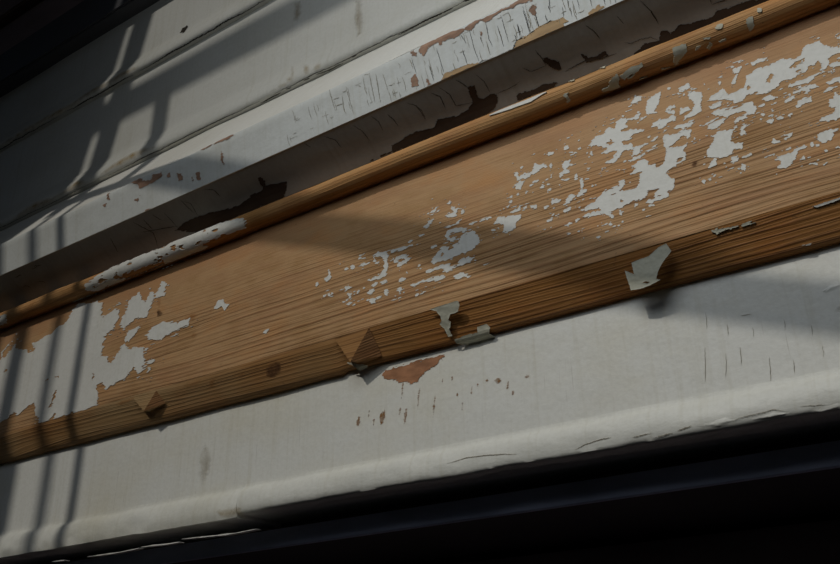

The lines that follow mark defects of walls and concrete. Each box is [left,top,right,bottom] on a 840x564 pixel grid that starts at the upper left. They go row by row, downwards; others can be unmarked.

peeling [411,0,536,56]
peeling [514,17,568,48]
peeling [602,0,769,92]
crack [114,0,623,173]
peeling [132,172,201,201]
peeling [315,33,840,306]
peeling [0,177,287,424]
peeling [431,301,495,345]
peeling [382,354,445,384]